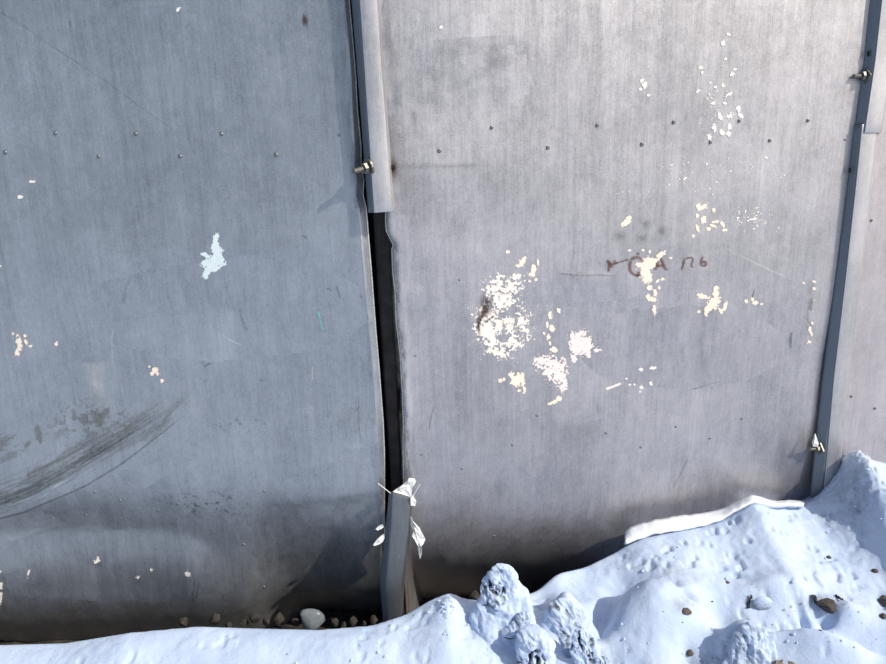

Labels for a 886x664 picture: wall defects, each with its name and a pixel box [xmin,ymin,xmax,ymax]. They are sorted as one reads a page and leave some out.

peeling [696,33,744,140]
peeling [199,233,227,279]
corrosion [477,298,491,331]
peeling [471,250,602,405]
peeling [628,249,672,316]
peeling [696,286,728,316]
leakage [0,415,148,505]